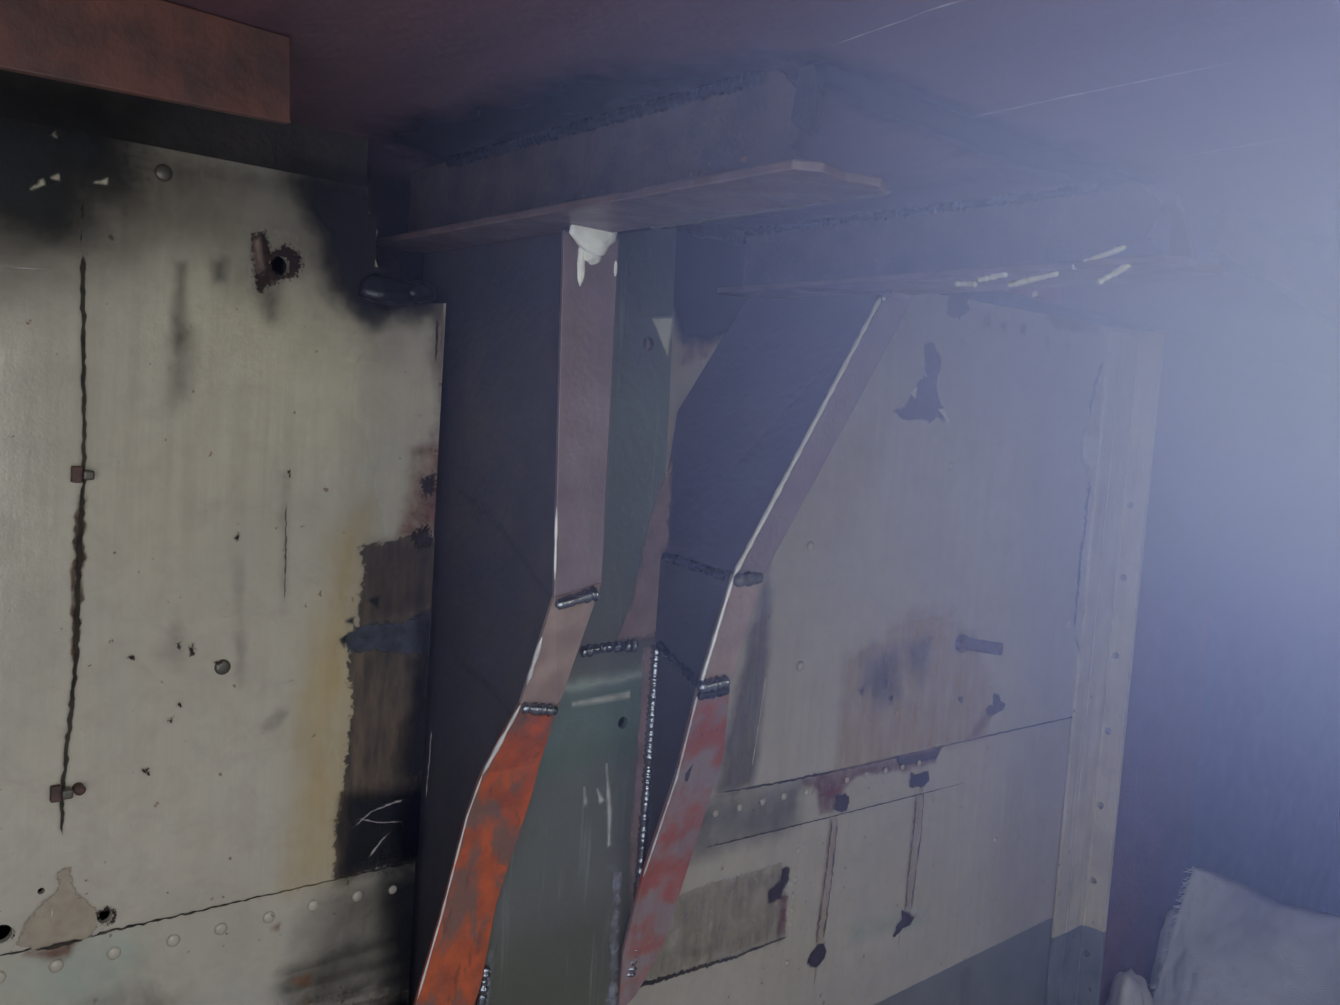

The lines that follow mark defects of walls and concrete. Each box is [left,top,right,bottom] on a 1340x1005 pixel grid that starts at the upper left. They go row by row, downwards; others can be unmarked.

leakage [0,90,122,240]
peeling [885,341,950,423]
crack [60,205,87,833]
peeling [11,867,117,950]
rust [805,748,942,968]